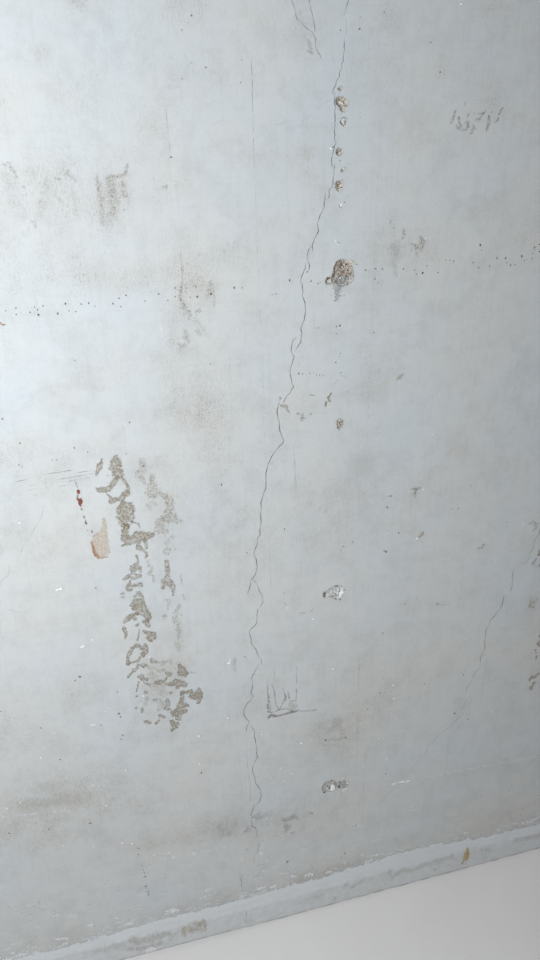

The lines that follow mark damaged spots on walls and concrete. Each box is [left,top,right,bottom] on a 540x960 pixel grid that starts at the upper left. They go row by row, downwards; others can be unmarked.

spalling [310,259,383,301]
peeling [95,455,203,732]